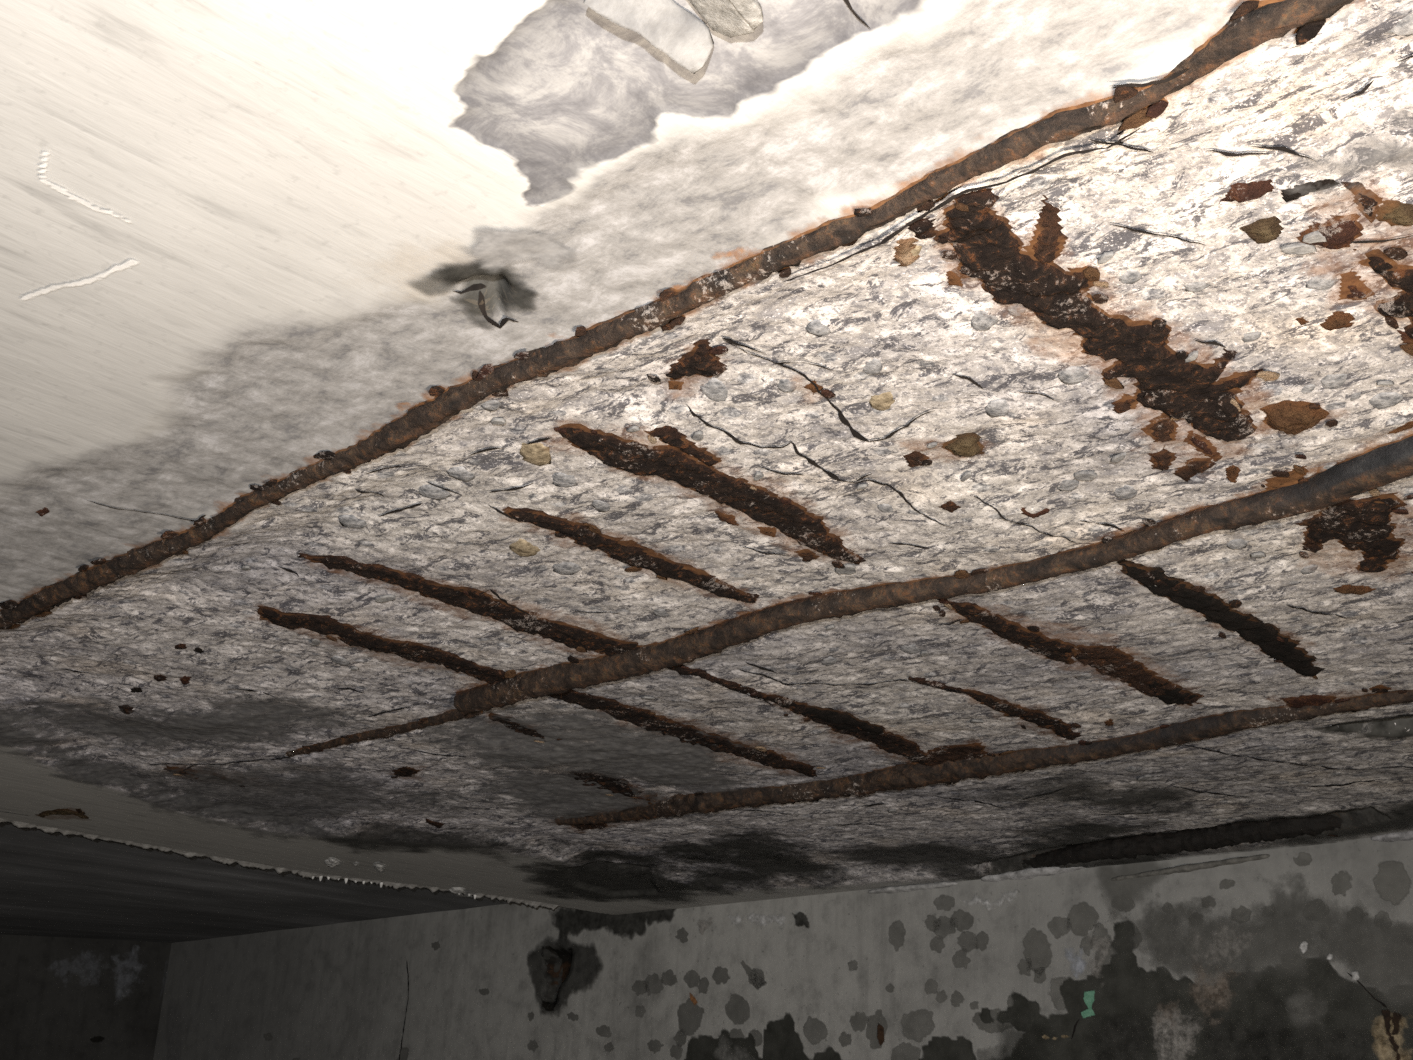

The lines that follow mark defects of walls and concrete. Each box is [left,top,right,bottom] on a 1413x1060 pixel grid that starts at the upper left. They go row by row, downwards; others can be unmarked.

spalling [1384,14,1413,37]
peeling [0,0,1261,610]
rust [502,506,841,640]
rust [554,423,866,569]
crack [686,338,952,528]
spalling [572,476,1413,804]
rust [893,188,1338,483]
rust [1117,559,1407,708]
spalling [1281,231,1327,255]
rust [1219,179,1413,356]
spalling [1369,392,1403,410]
water stain [0,695,1413,1060]